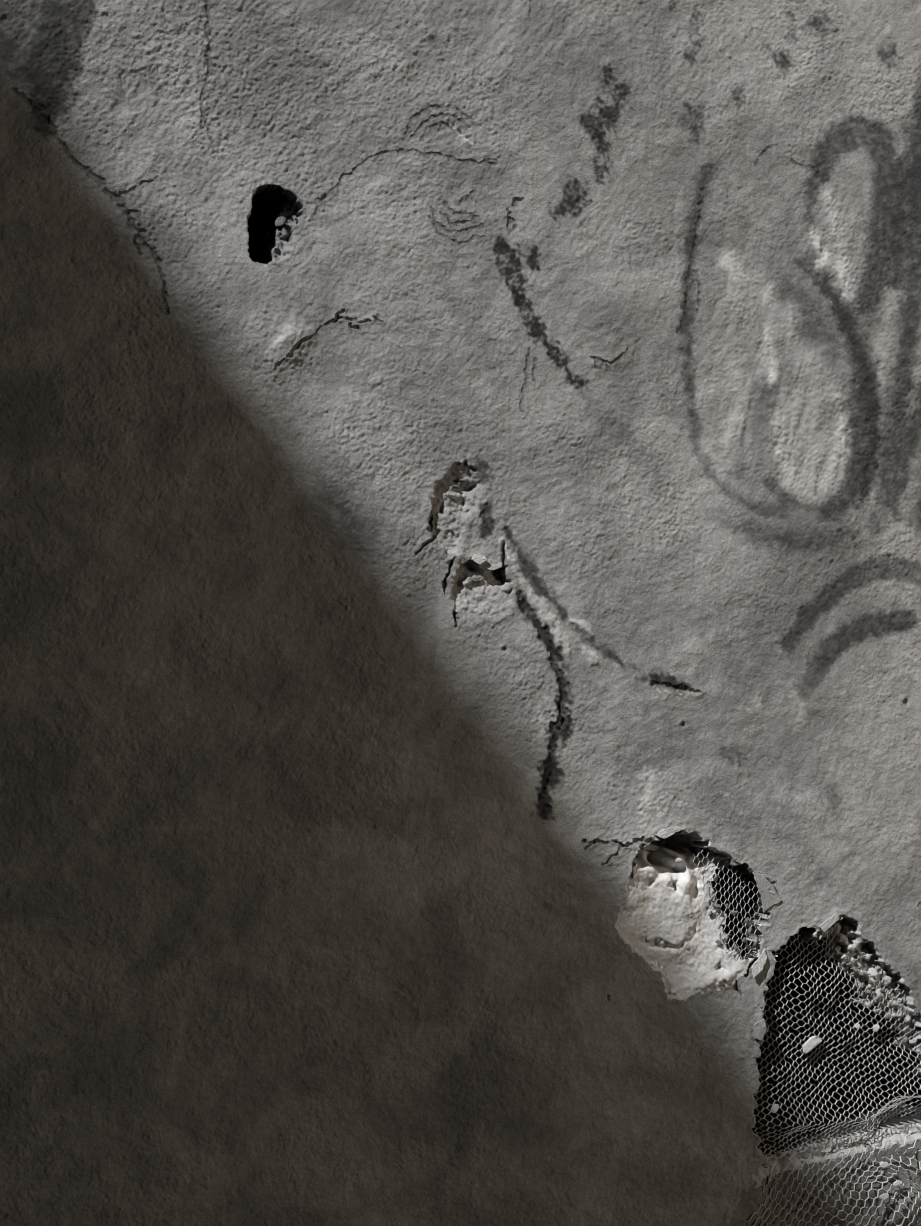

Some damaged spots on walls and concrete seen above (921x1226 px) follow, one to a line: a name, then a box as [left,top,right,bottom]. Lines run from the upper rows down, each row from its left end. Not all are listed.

spalling [246,183,307,265]
crack [310,103,525,246]
crack [270,308,384,375]
crack [414,509,459,628]
spalling [431,458,516,624]
crack [500,542,568,813]
spalling [615,826,921,1226]